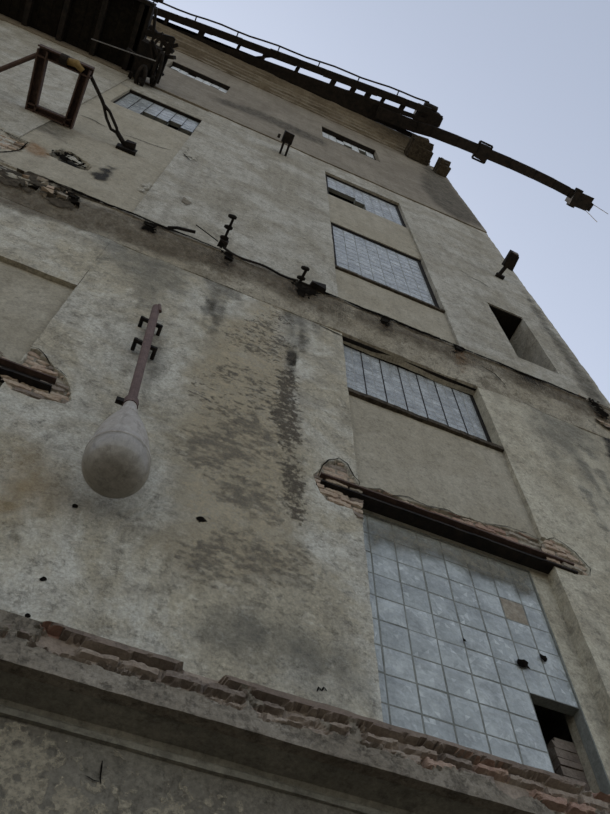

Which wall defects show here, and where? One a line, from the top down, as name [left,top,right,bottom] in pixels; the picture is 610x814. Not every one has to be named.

peeling [17,168,80,209]
spalling [0,351,70,403]
spalling [579,393,610,427]
flaking render [0,609,610,814]